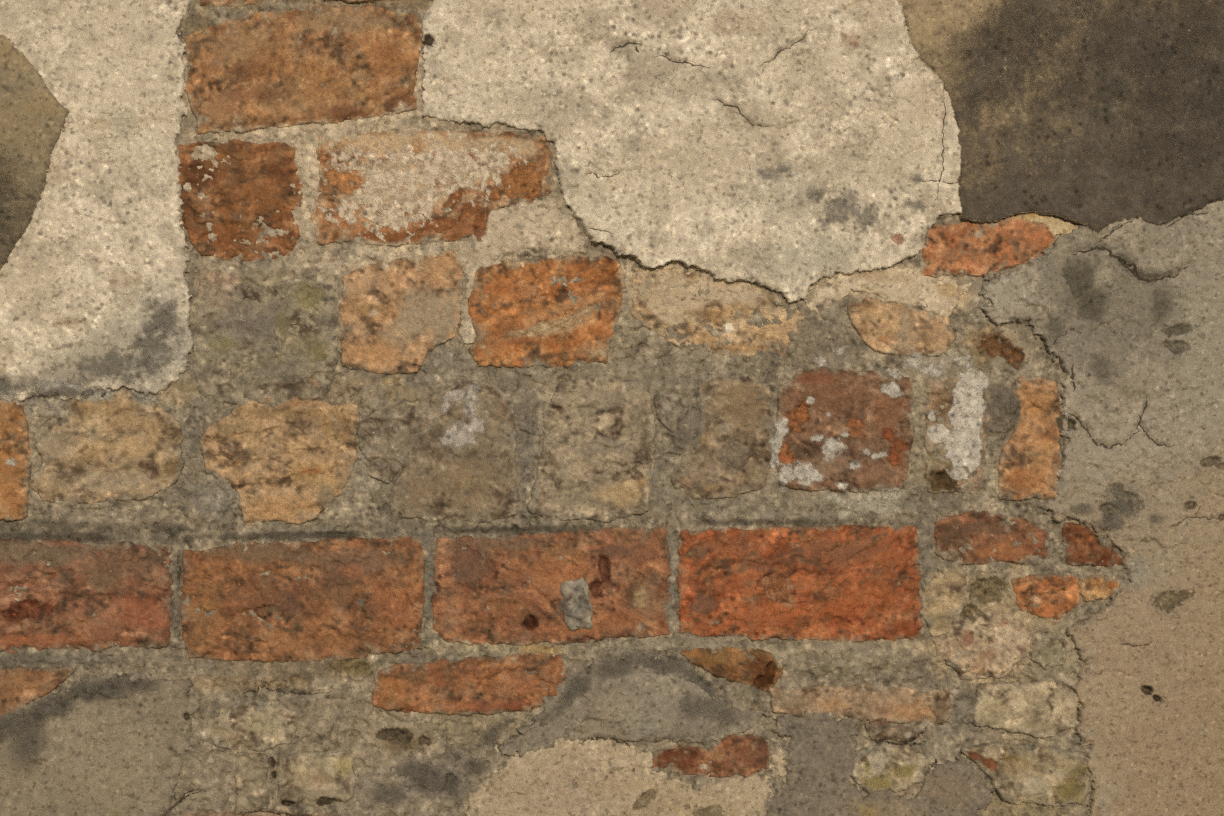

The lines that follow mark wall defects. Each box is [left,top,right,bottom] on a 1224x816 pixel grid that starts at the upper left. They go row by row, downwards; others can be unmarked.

crack [609,42,711,68]
crack [760,28,816,67]
flaking render [898,0,947,88]
flaking render [169,0,191,249]
crack [712,99,770,127]
damp [952,0,1224,232]
spalling [323,134,545,241]
flaking render [589,234,814,302]
damp [814,348,845,366]
damp [881,351,972,398]
spalling [977,332,1028,368]
damp [769,417,907,519]